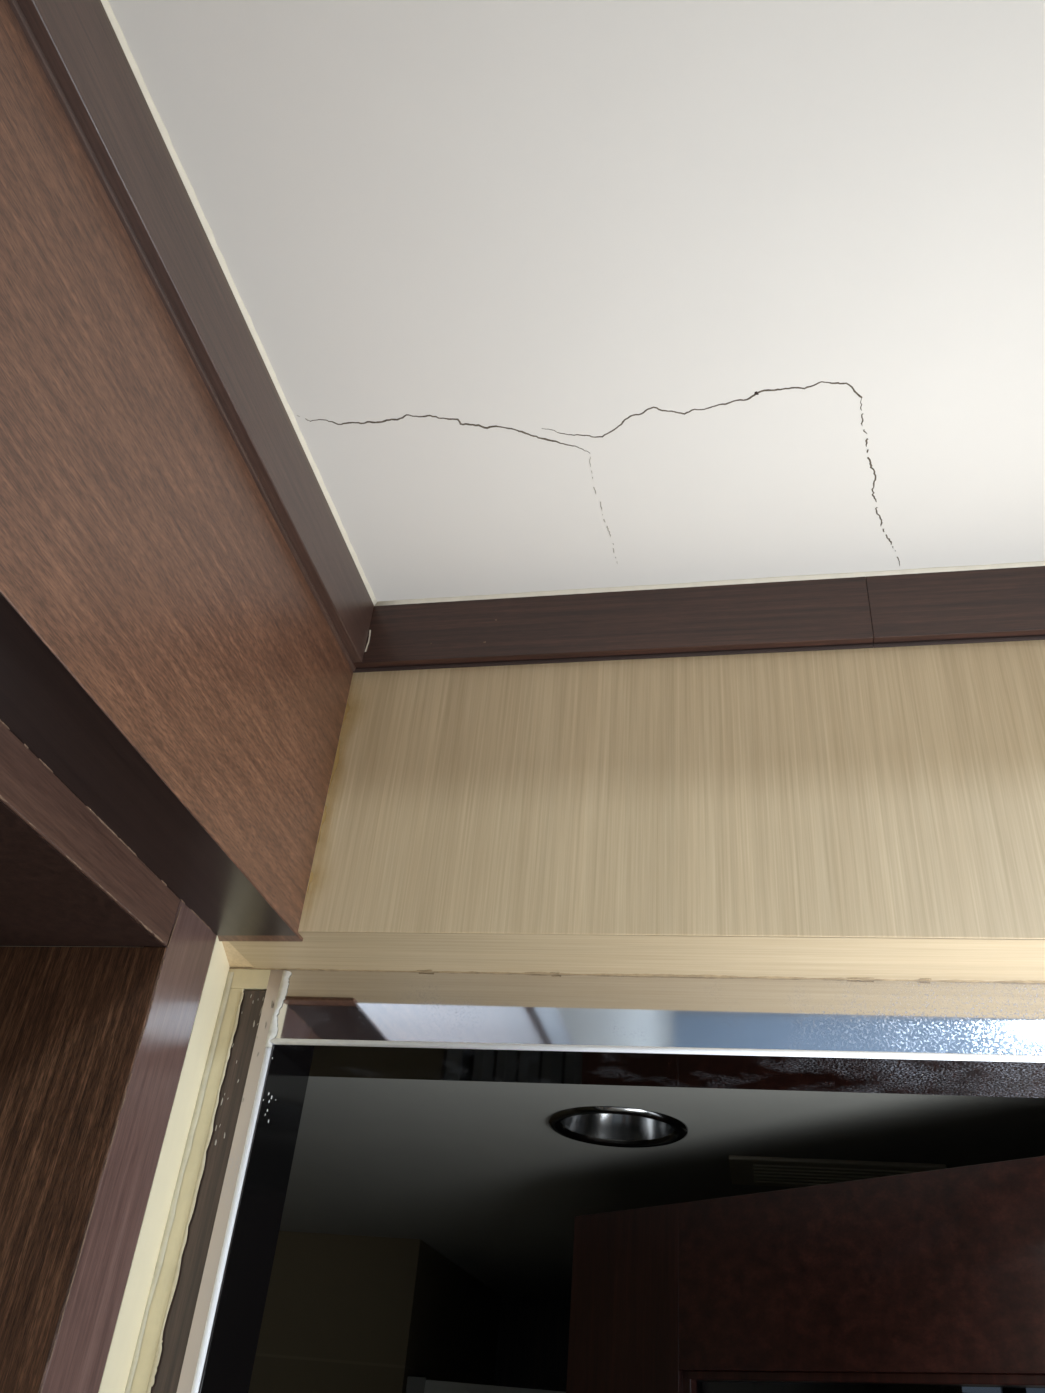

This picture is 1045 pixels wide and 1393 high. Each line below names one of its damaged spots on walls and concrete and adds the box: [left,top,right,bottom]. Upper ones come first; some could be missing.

crack [297,381,900,566]